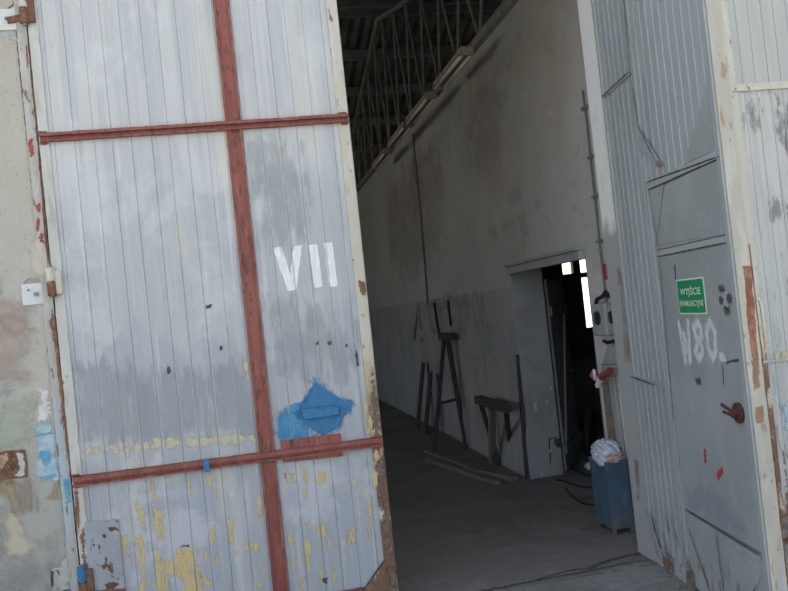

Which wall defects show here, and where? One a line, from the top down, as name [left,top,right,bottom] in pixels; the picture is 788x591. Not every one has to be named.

corrosion [27,32,49,262]
corrosion [743,266,760,389]
corrosion [49,309,72,475]
peeling [120,477,218,591]
peeling [82,434,258,465]
peeling [227,518,265,590]
peeling [285,469,326,498]
peeling [288,520,336,589]
peeling [346,462,378,546]
corrosion [371,379,382,436]
corrosion [376,448,398,591]
corrosion [756,405,764,423]